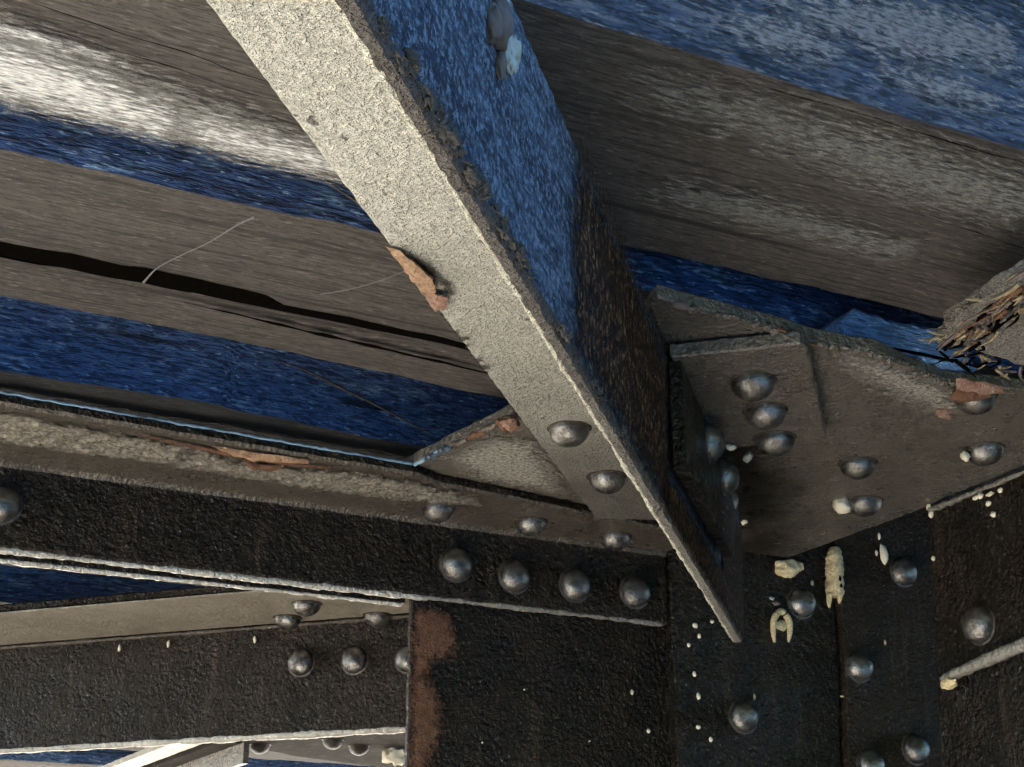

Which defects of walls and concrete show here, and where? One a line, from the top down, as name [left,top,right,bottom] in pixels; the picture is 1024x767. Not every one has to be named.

crack [0,241,488,374]
peeling [385,245,470,348]
peeling [142,435,332,472]
corrosion [407,607,457,767]